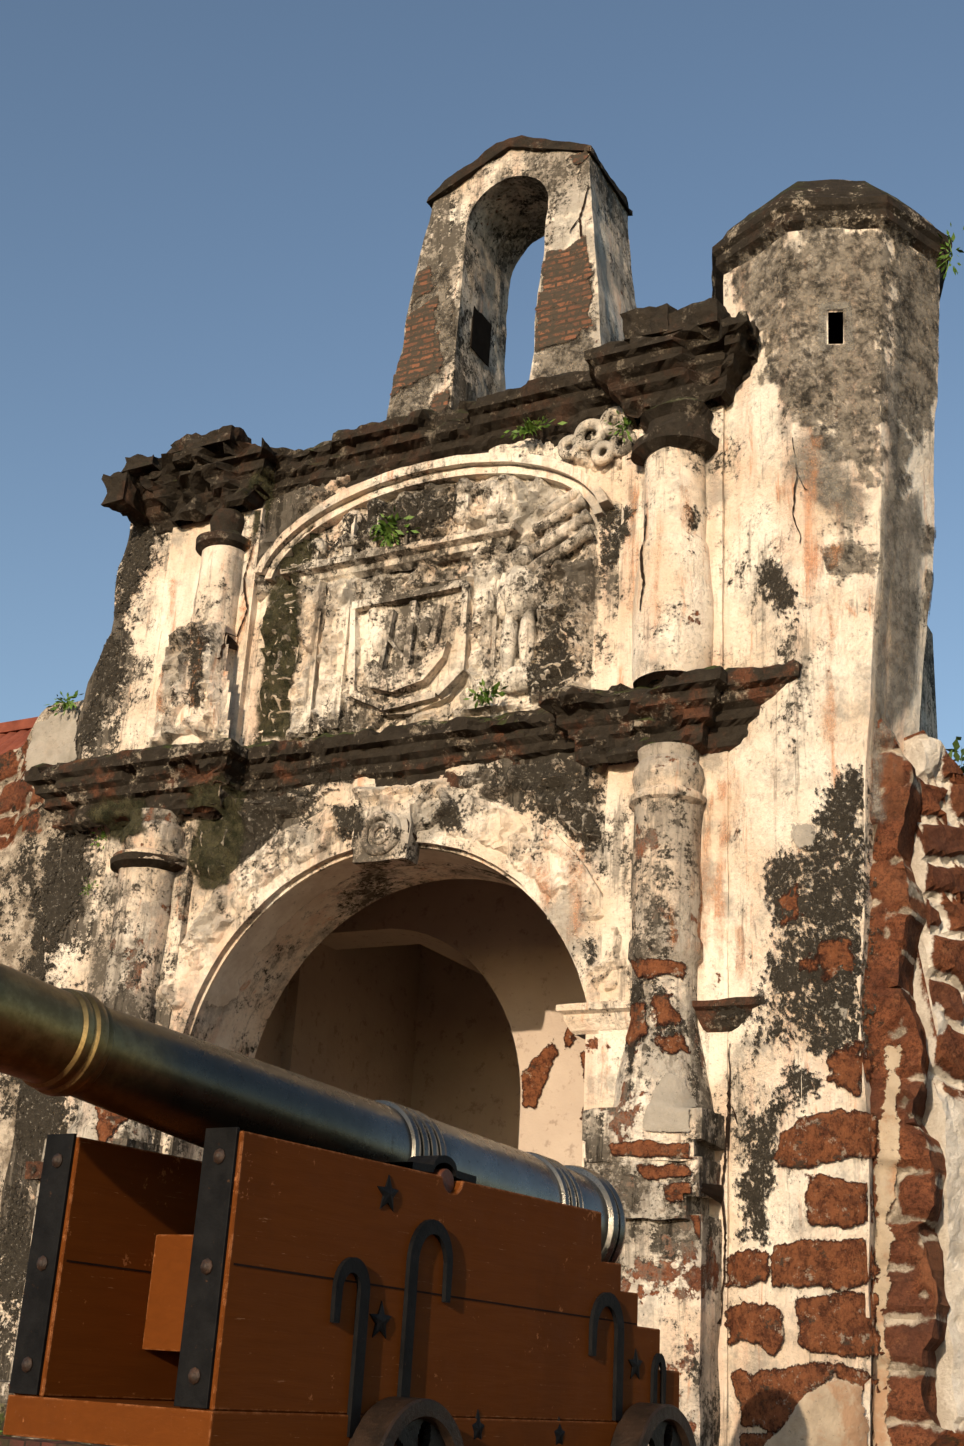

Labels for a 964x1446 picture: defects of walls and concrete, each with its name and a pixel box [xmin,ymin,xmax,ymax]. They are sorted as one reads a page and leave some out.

spalling [390,265,450,411]
spalling [535,235,594,352]
crack [639,514,647,611]
crack [792,437,809,543]
damp [724,212,941,818]
spalling [626,957,691,1054]
spalling [521,1027,585,1110]
spalling [94,1106,128,1142]
spalling [722,1108,885,1446]